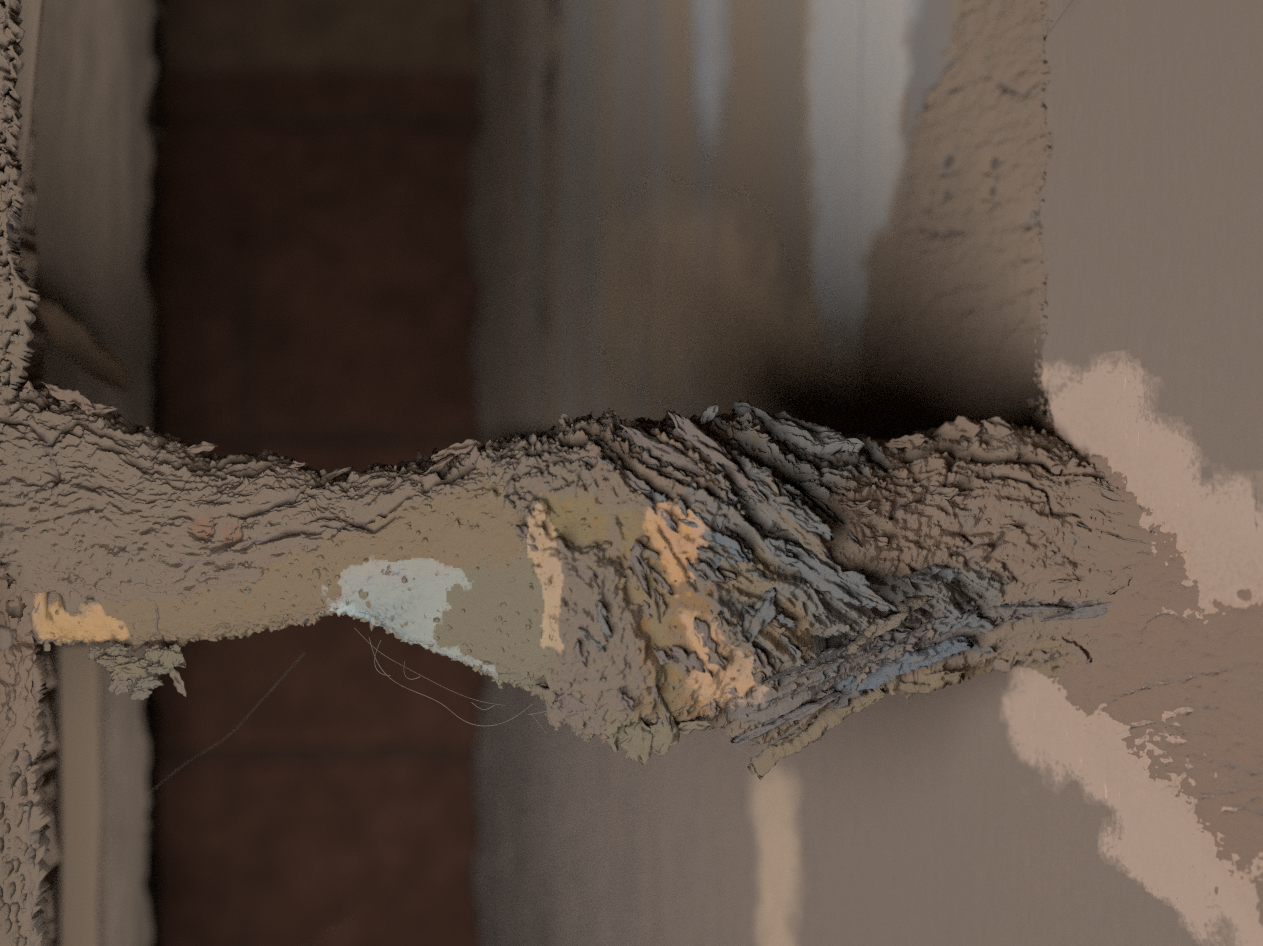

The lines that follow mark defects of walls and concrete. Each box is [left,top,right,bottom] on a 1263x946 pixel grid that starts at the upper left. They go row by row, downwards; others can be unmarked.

crack [24,388,67,483]
crack [245,484,396,547]
peeling [515,524,543,552]
peeling [562,402,1115,745]